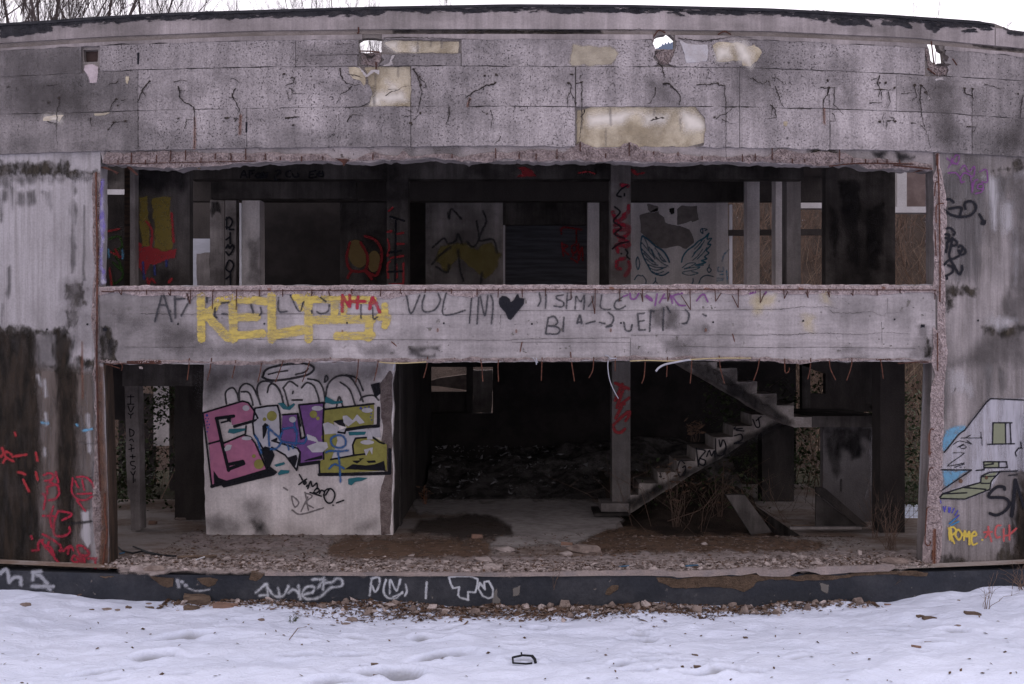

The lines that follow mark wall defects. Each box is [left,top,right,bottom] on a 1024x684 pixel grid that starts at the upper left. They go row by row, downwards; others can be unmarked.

crack [90,80,195,156]
crack [224,78,241,134]
peeling [348,40,459,107]
crack [446,73,501,143]
crack [647,62,732,159]
peeling [647,30,762,66]
crack [820,79,843,147]
spalling [830,18,957,81]
crack [869,75,931,148]
spalling [91,107,948,593]
damp [37,367,96,568]